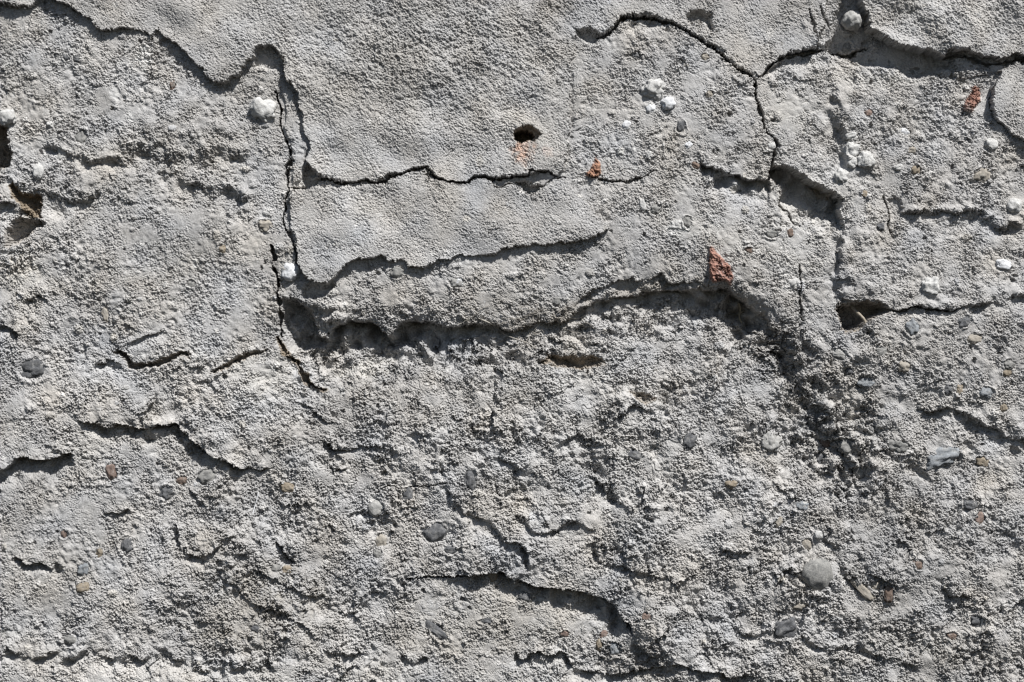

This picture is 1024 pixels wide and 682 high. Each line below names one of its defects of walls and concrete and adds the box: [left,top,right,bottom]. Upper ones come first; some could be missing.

crack [942,54,1024,68]
crack [598,5,869,227]
crack [321,166,566,189]
spalling [0,0,1024,352]
crack [110,92,328,393]
crack [882,196,895,239]
crack [797,264,805,322]
crack [886,305,962,314]
crack [0,452,75,477]
crack [79,419,271,474]
crack [401,571,634,639]